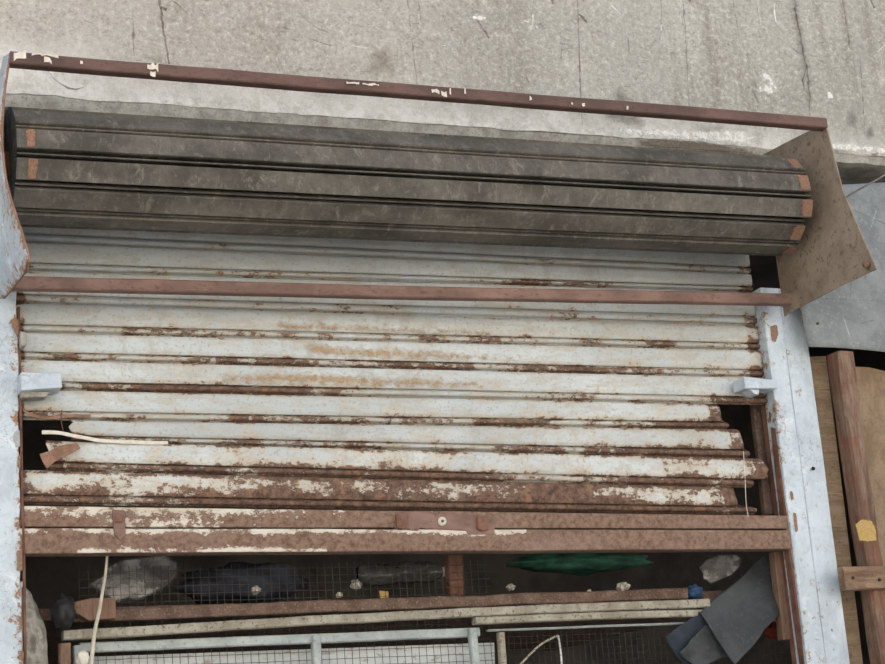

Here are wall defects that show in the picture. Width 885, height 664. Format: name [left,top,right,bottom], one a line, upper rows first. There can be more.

crack [159,0,177,63]
crack [794,8,811,110]
corrosion [231,374,441,387]
corrosion [313,347,422,357]